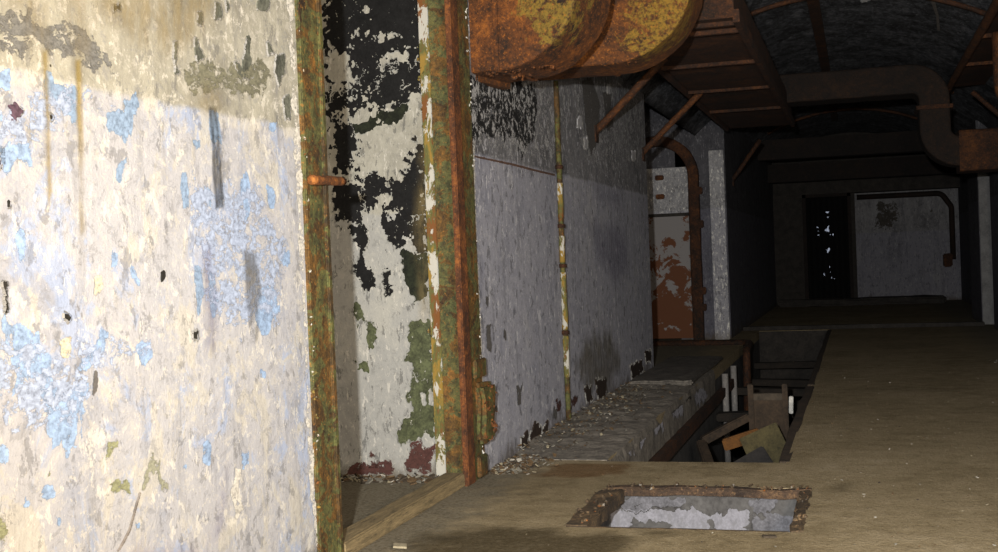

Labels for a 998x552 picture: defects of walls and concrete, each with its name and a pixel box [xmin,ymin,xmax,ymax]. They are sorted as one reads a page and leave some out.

peeling [0,7,115,74]
peeling [0,68,103,176]
peeling [99,91,139,143]
peeling [116,157,127,183]
peeling [172,0,308,374]
peeling [321,0,429,373]
peeling [0,444,9,464]
peeling [41,484,56,500]
peeling [0,310,153,459]
peeling [230,451,249,519]
peeling [306,388,318,545]
peeling [340,319,439,486]